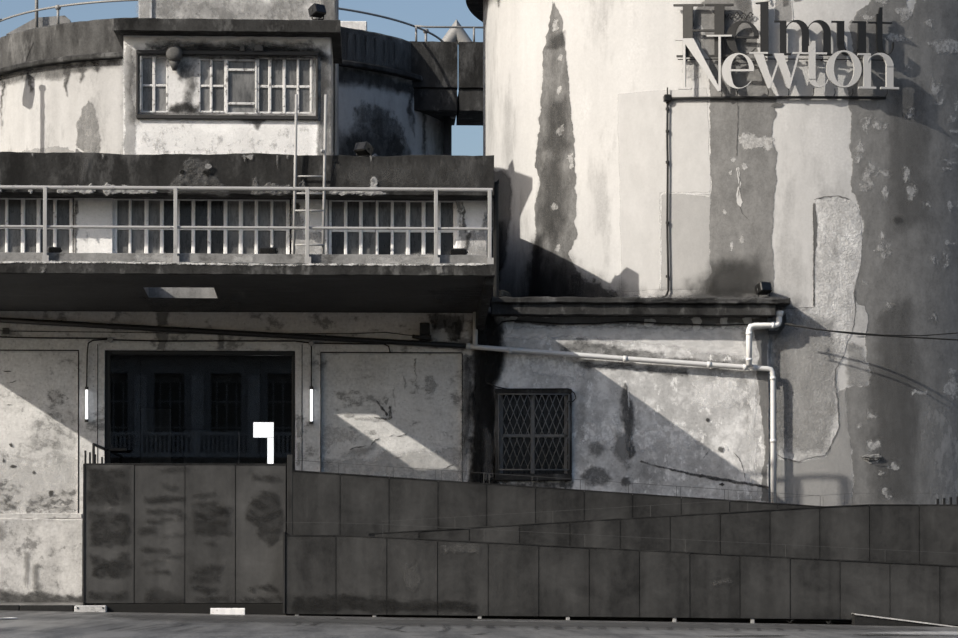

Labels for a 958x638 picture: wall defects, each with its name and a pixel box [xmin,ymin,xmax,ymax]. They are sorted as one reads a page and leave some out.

leakage [0,59,118,103]
spalling [57,183,158,196]
leakage [169,62,199,113]
spalling [170,159,227,195]
leakage [107,171,512,274]
leakage [317,32,479,187]
peeling [530,3,581,283]
leakage [518,267,622,298]
peeling [682,0,784,293]
peeling [769,0,958,506]
leakage [321,312,770,502]
leakage [0,553,83,602]